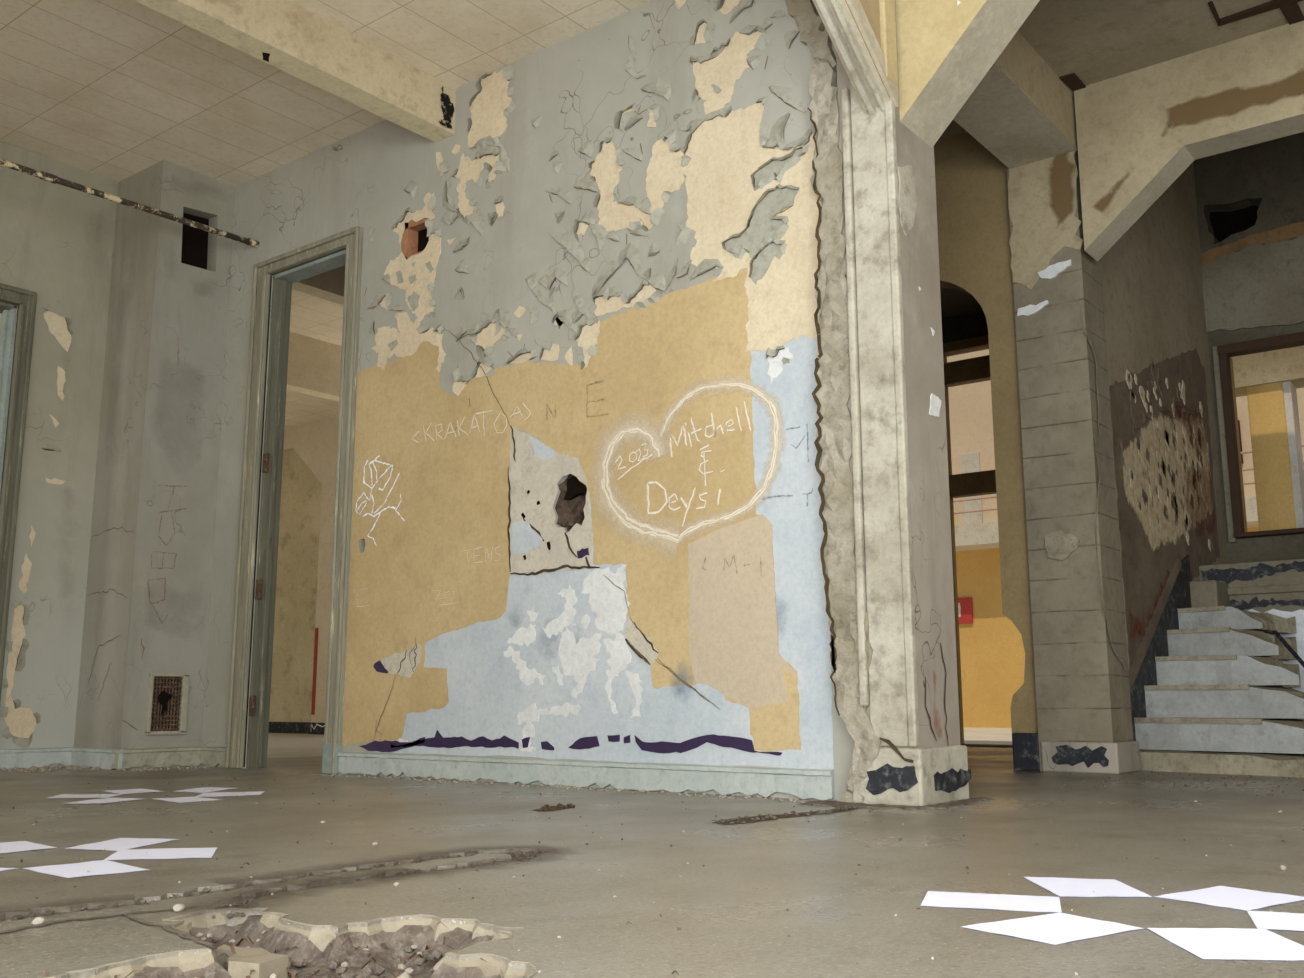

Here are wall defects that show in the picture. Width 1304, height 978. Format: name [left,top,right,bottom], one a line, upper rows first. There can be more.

peeling [436,65,516,225]
peeling [41,307,74,352]
peeling [57,366,66,401]
peeling [371,192,663,396]
flaking render [573,0,918,803]
peeling [929,393,941,417]
peeling [1119,361,1214,552]
flaking render [503,426,659,752]
peeling [934,768,971,793]
spalling [45,908,538,978]